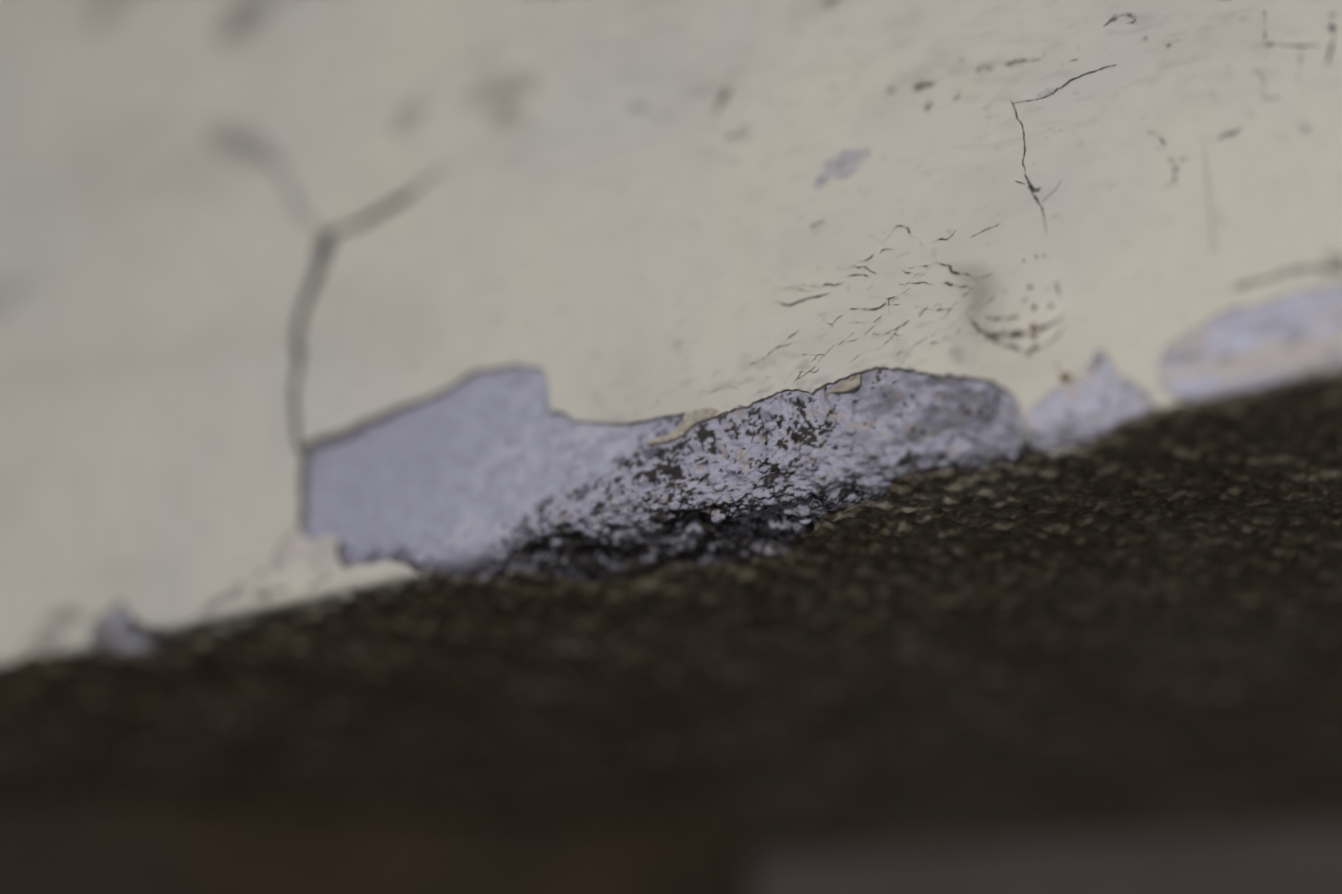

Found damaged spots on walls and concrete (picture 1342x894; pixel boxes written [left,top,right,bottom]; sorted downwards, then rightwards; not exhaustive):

crack [1012,65,1115,228]
crack [290,173,436,453]
flaking render [305,285,1342,582]